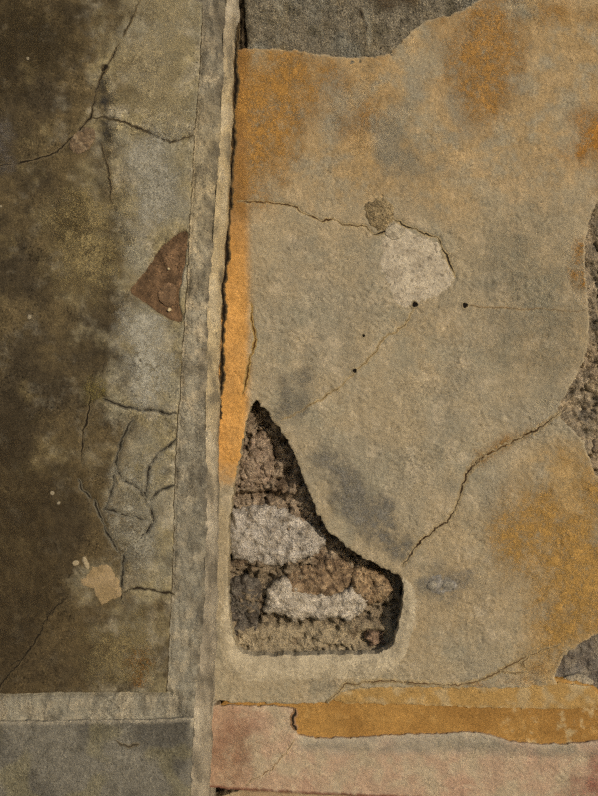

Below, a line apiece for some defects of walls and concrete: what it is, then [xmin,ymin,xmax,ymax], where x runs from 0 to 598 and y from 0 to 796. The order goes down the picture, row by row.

crack [0,0,194,167]
crack [101,142,114,204]
crack [219,23,456,421]
spalling [380,223,454,308]
crack [77,380,178,603]
spalling [219,400,417,682]
crack [401,411,562,568]